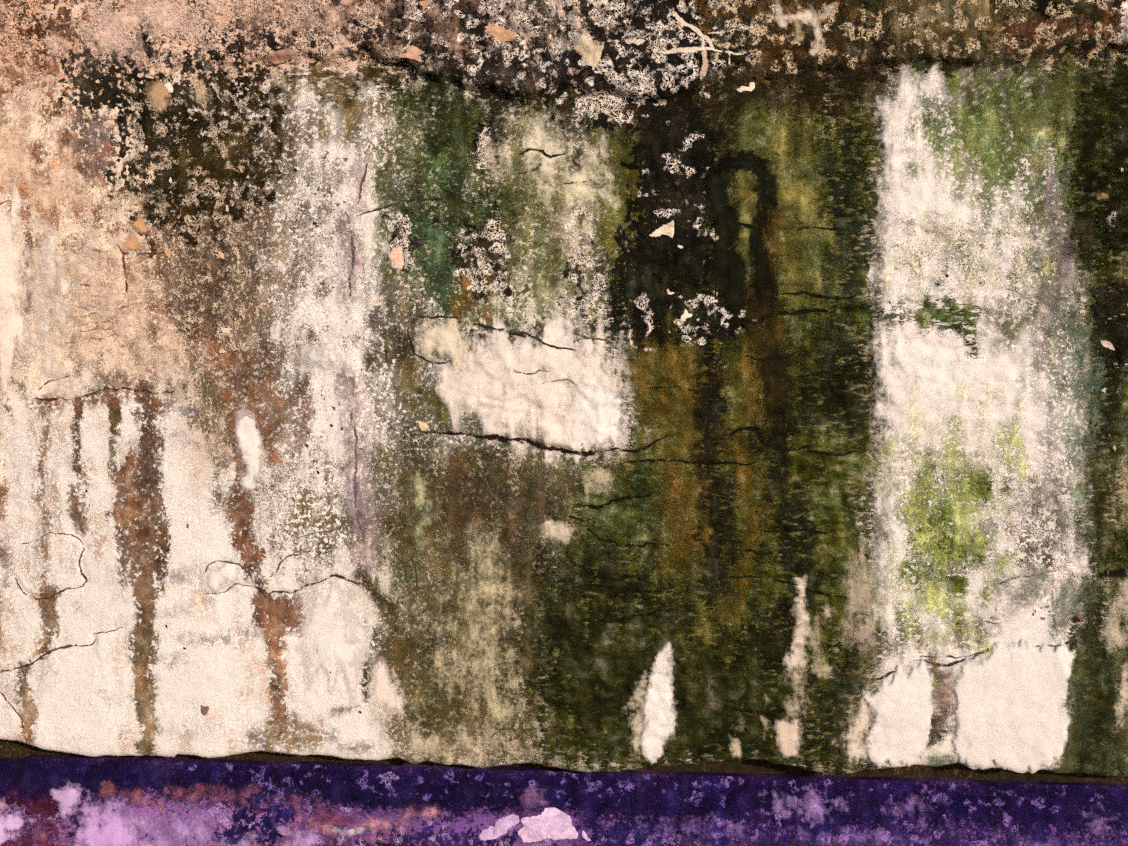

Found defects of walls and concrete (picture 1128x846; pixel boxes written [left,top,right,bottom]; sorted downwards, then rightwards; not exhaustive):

leakage [0,113,121,393]
leakage [375,58,470,352]
crack [519,148,566,174]
crack [621,161,639,169]
crack [408,278,920,475]
leakage [476,6,1128,776]
corrosion [263,439,283,467]
crack [15,532,88,600]
leakage [0,297,1128,841]
crack [0,627,123,728]
crack [730,707,804,715]